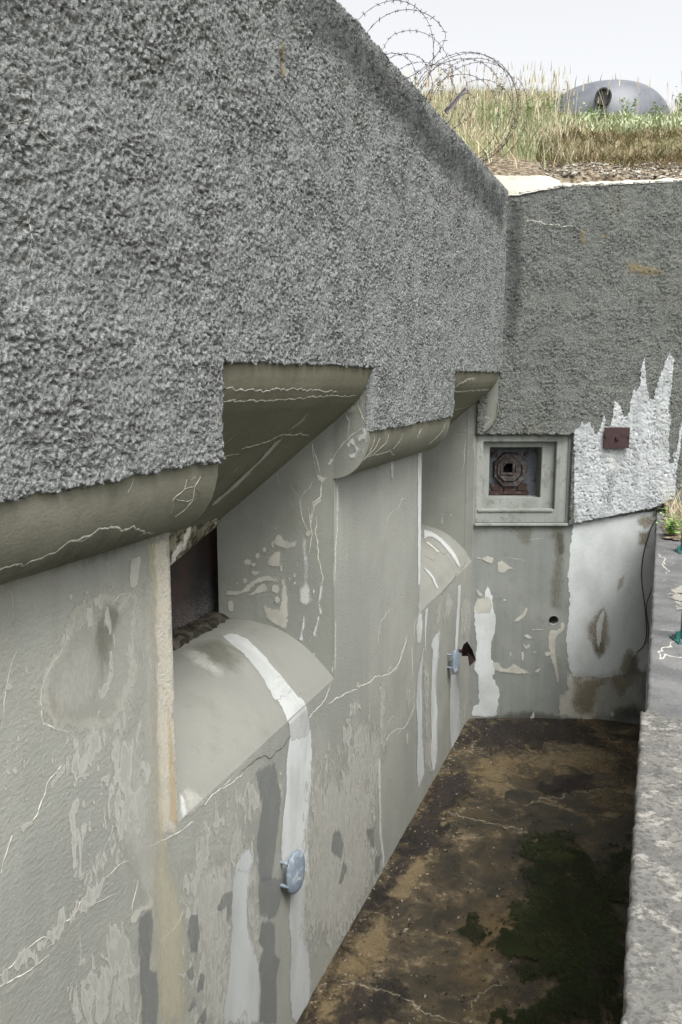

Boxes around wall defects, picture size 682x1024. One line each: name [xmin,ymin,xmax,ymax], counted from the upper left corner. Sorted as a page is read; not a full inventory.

crack [171,476,201,516]
crack [223,373,496,590]
crack [0,525,155,727]
peeling [226,527,298,628]
water stain [493,622,644,719]
crack [0,861,161,996]
water stain [188,915,199,952]
water stain [218,764,282,1024]
water stain [187,966,207,1023]